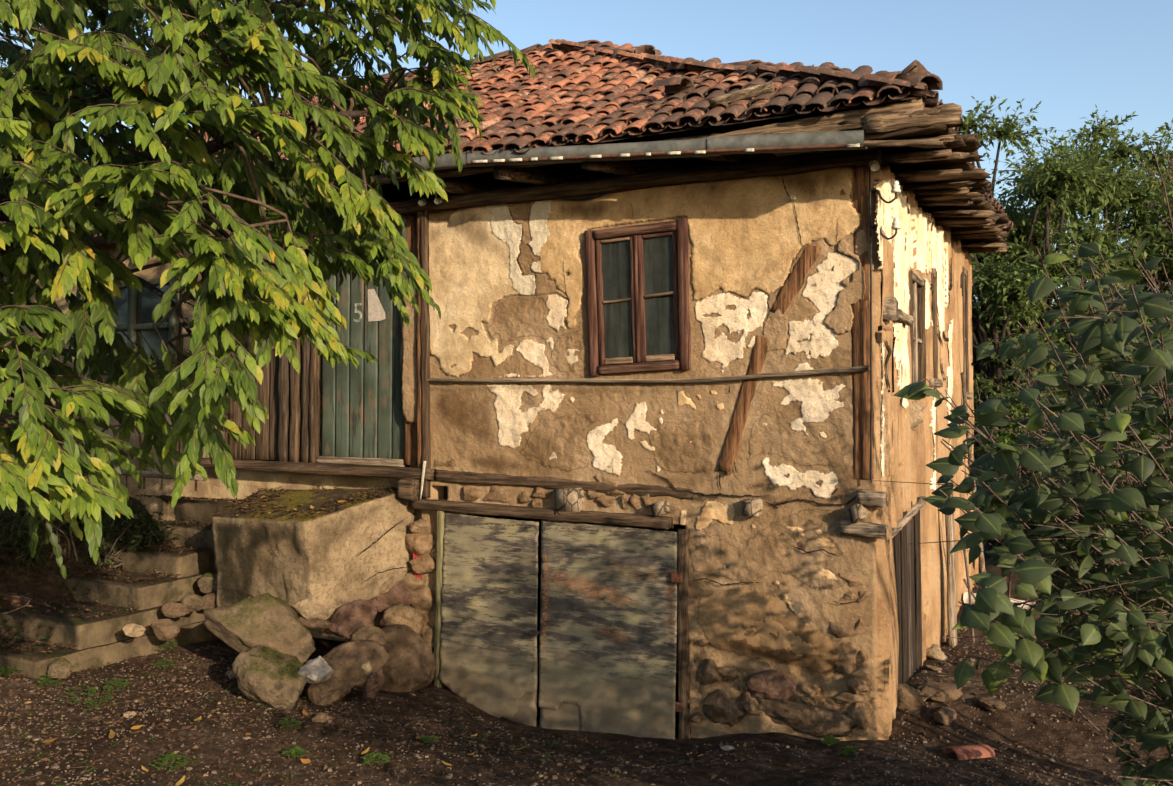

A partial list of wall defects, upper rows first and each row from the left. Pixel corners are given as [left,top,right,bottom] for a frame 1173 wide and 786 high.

spalling [486,199,724,476]
spalling [680,239,866,616]
flaking render [874,178,953,491]